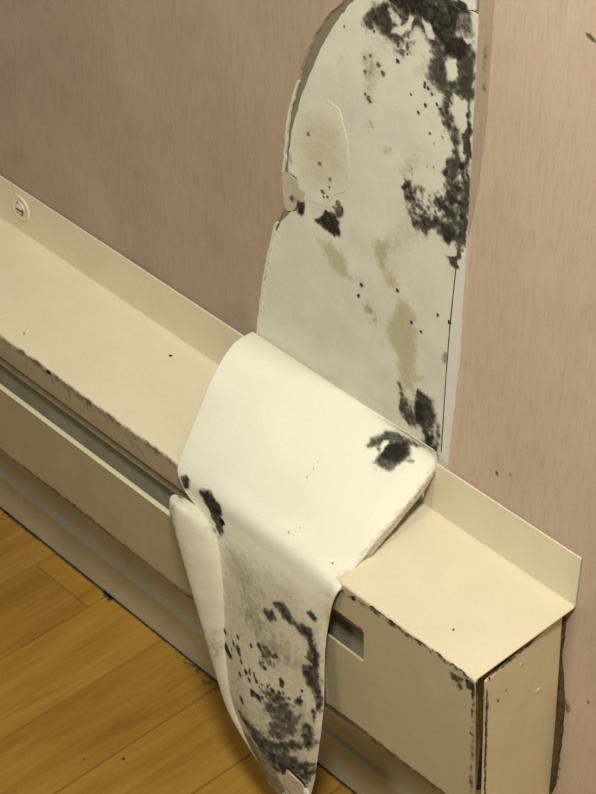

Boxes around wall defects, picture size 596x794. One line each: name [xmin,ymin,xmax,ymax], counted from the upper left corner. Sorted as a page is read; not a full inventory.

water stain [314,177,350,278]
water stain [363,0,476,269]
water stain [367,277,440,471]